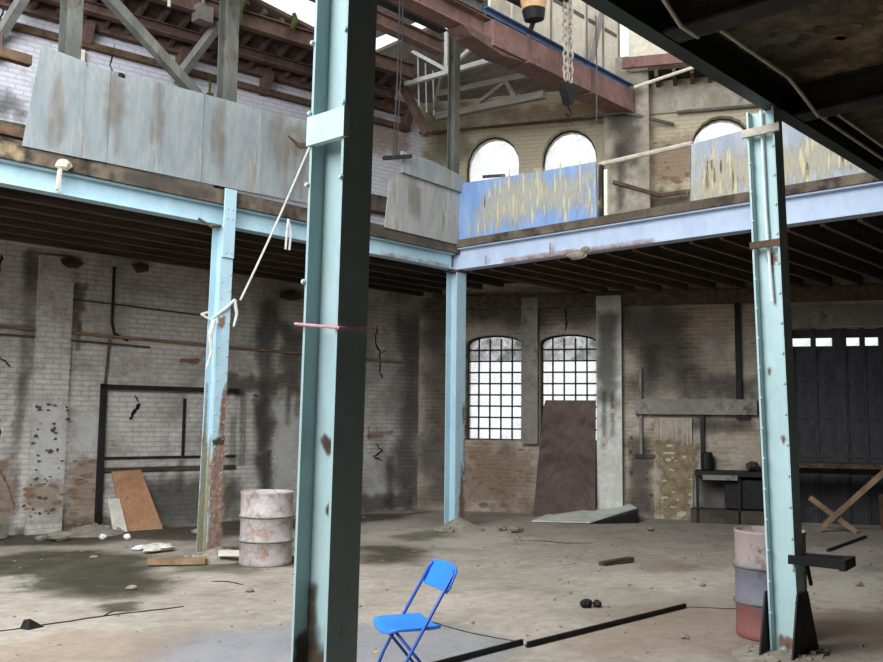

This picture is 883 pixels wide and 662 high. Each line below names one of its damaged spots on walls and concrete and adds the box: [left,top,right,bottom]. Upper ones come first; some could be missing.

spalling [0,142,25,161]
peeling [469,161,595,237]
peeling [661,147,749,200]
peeling [783,136,858,195]
leakage [228,374,264,395]
leakage [279,325,303,398]
crack [0,469,15,508]
flaking render [22,403,104,517]
rust [197,384,227,552]
peeling [628,436,699,520]